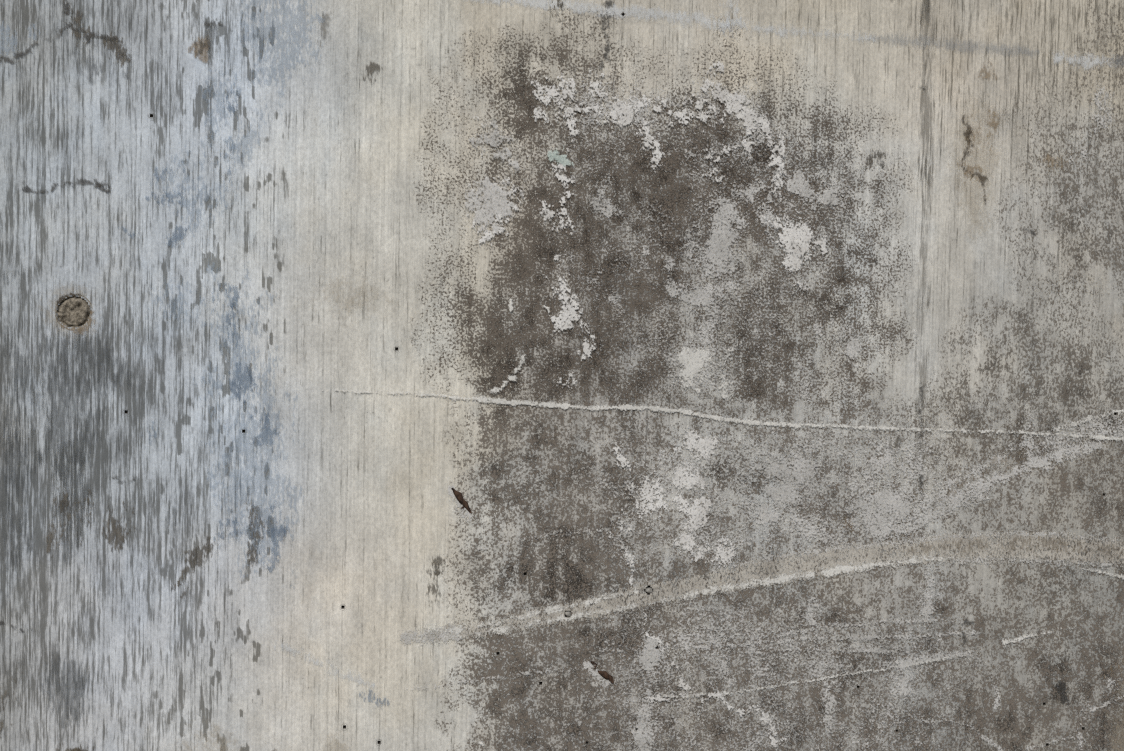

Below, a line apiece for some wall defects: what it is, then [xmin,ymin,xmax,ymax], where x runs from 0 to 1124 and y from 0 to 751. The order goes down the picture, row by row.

water stain [335,0,1124,751]